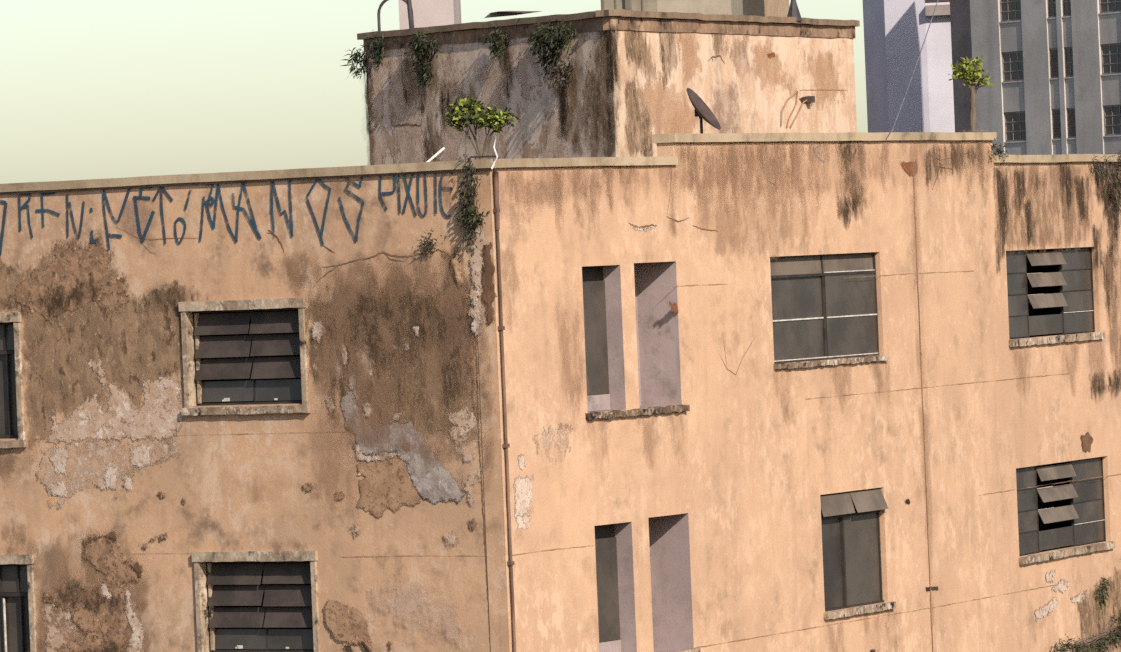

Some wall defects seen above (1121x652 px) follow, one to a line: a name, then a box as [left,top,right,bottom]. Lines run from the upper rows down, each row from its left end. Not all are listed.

leakage [401,48,450,162]
leakage [499,39,513,97]
leakage [559,25,702,181]
leakage [0,236,194,447]
flaking render [35,359,185,510]
crack [317,245,450,282]
leakage [305,250,484,461]
spalling [311,290,482,547]
peeling [445,221,488,339]
leakage [926,140,1121,396]
peeling [41,530,145,652]
spalling [323,600,372,652]